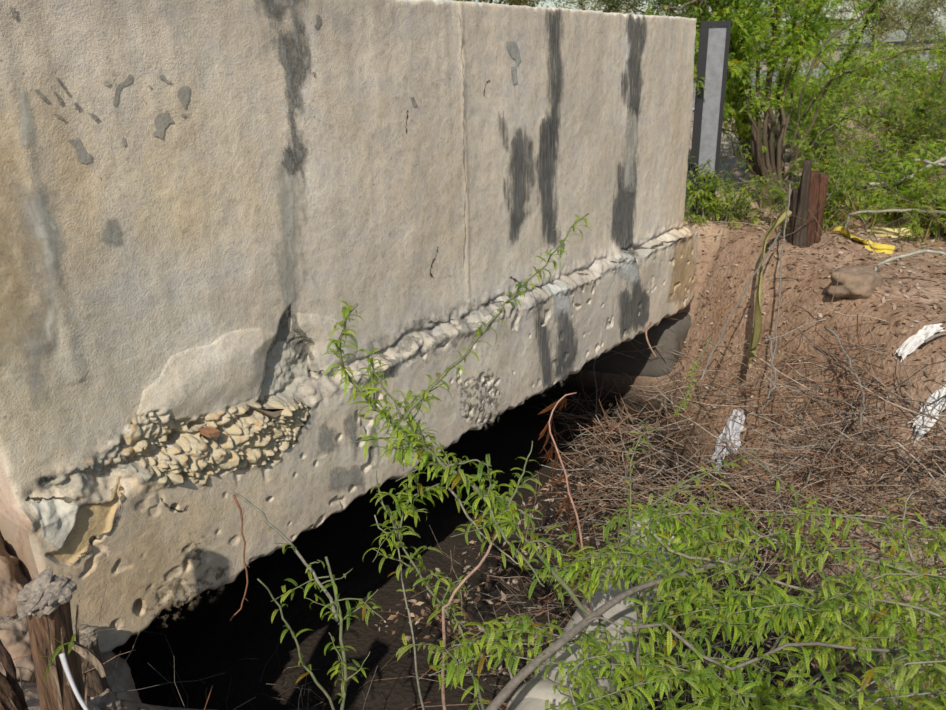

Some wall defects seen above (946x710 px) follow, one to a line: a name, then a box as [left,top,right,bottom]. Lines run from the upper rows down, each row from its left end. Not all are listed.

leakage [263,0,311,312]
crack [459,17,490,265]
leakage [499,10,563,245]
leakage [612,14,650,338]
spalling [29,306,320,564]
leakage [536,281,578,386]